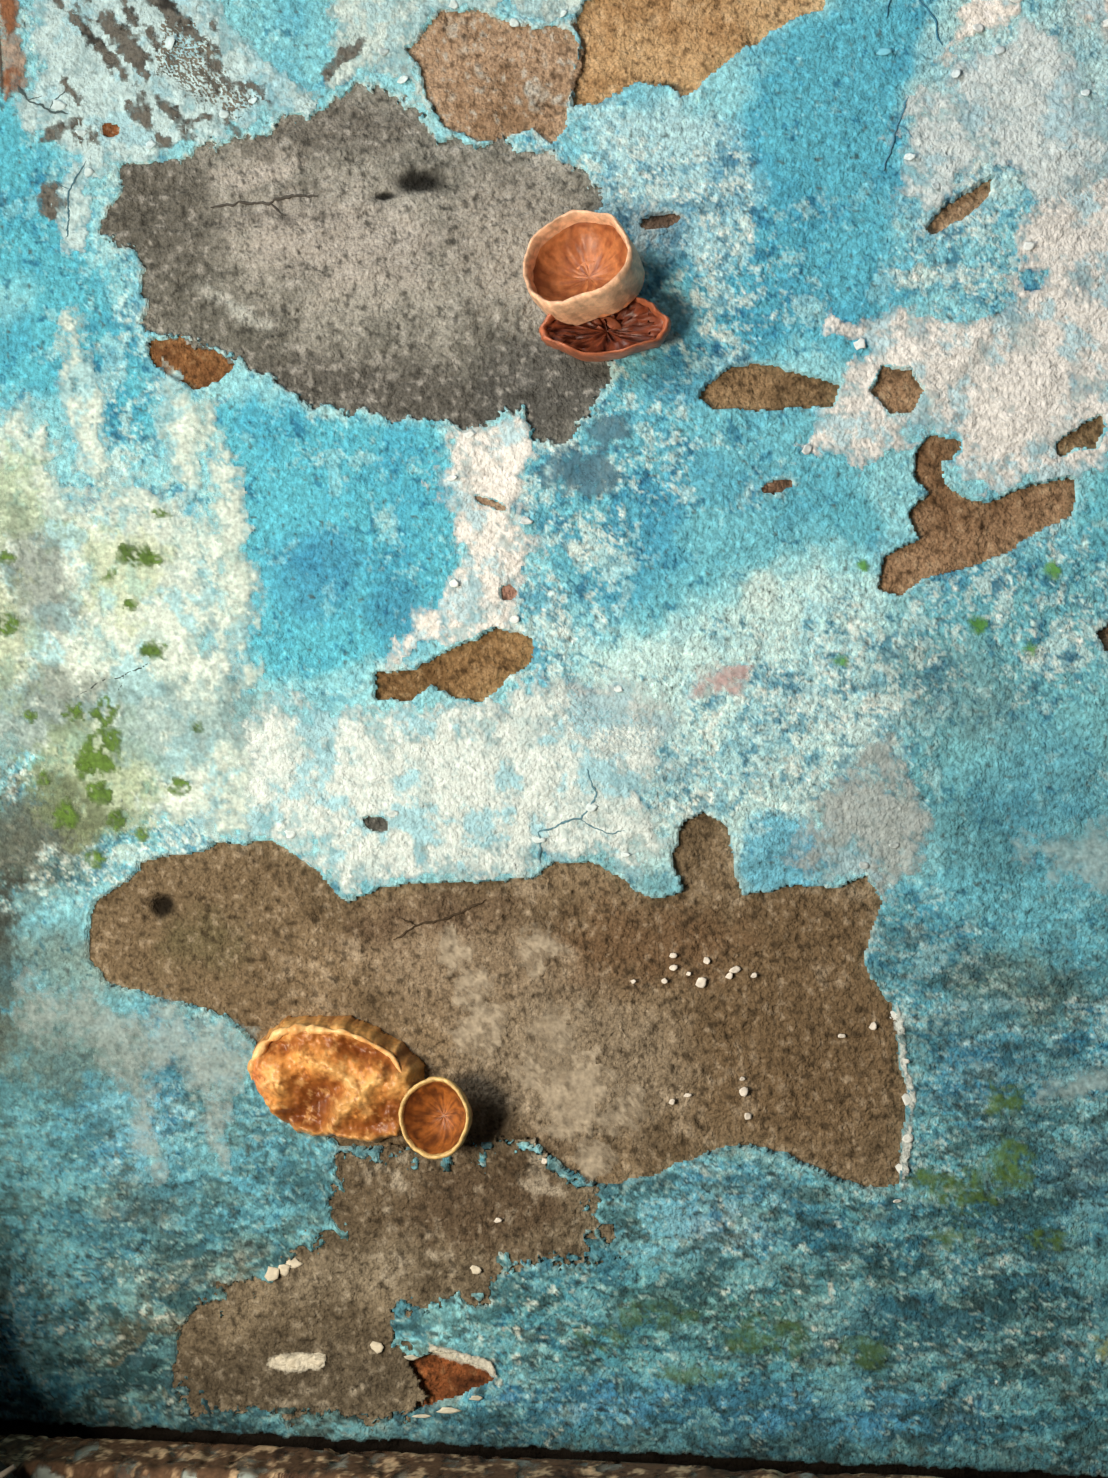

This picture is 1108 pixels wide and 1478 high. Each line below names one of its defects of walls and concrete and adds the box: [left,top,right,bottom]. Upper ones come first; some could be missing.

peeling [15,0,318,254]
spalling [325,0,825,144]
spalling [149,335,235,390]
peeling [699,0,1108,596]
leakage [0,311,263,834]
spalling [1096,624,1108,651]
spalling [89,417,932,1431]
leakage [1043,830,1108,892]
leakage [1040,1074,1106,1096]
corrosion [0,1434,942,1478]